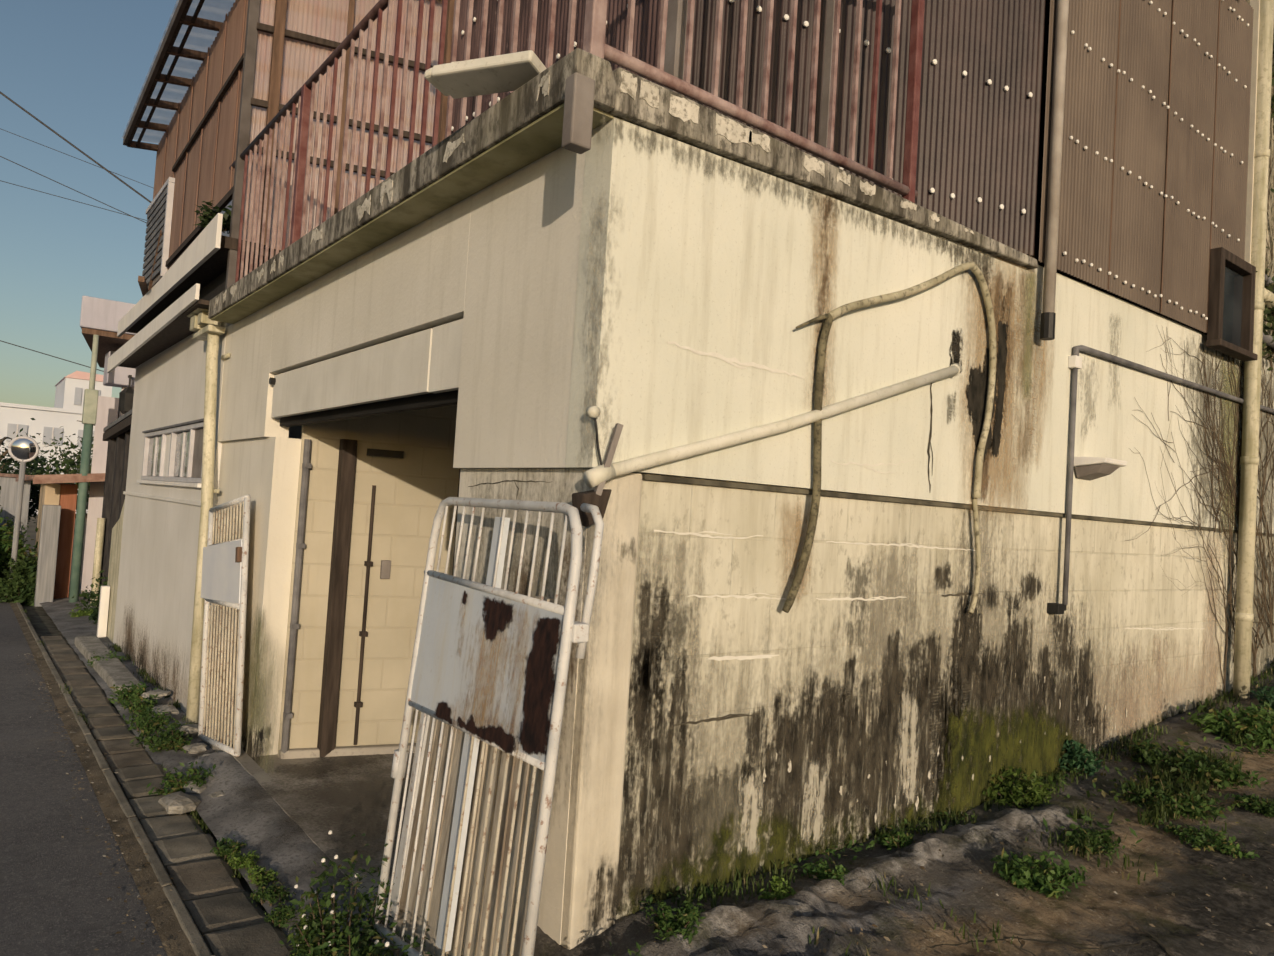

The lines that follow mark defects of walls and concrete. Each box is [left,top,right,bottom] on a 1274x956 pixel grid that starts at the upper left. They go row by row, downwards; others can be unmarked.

peeling [619,71,699,124]
peeling [357,179,393,222]
peeling [443,134,465,163]
peeling [715,113,771,152]
peeling [803,155,876,196]
peeling [900,200,917,210]
corrosion [815,199,836,379]
crack [926,383,934,491]
leakage [478,472,571,606]
corrosion [793,510,810,579]
leakage [589,117,1130,928]
leakage [122,613,178,701]